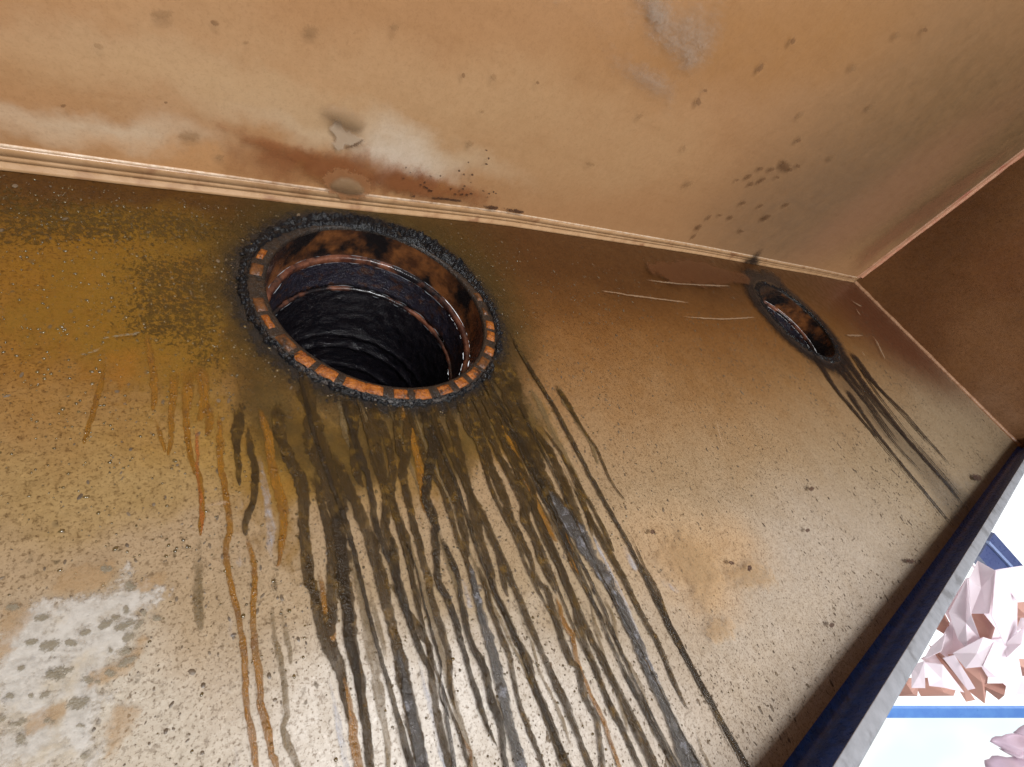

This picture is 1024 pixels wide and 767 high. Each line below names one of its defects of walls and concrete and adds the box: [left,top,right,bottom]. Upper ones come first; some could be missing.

peeling [331,122,364,150]
rust [250,140,478,197]
water stain [82,372,105,444]
water stain [814,349,963,526]
water stain [105,332,750,767]